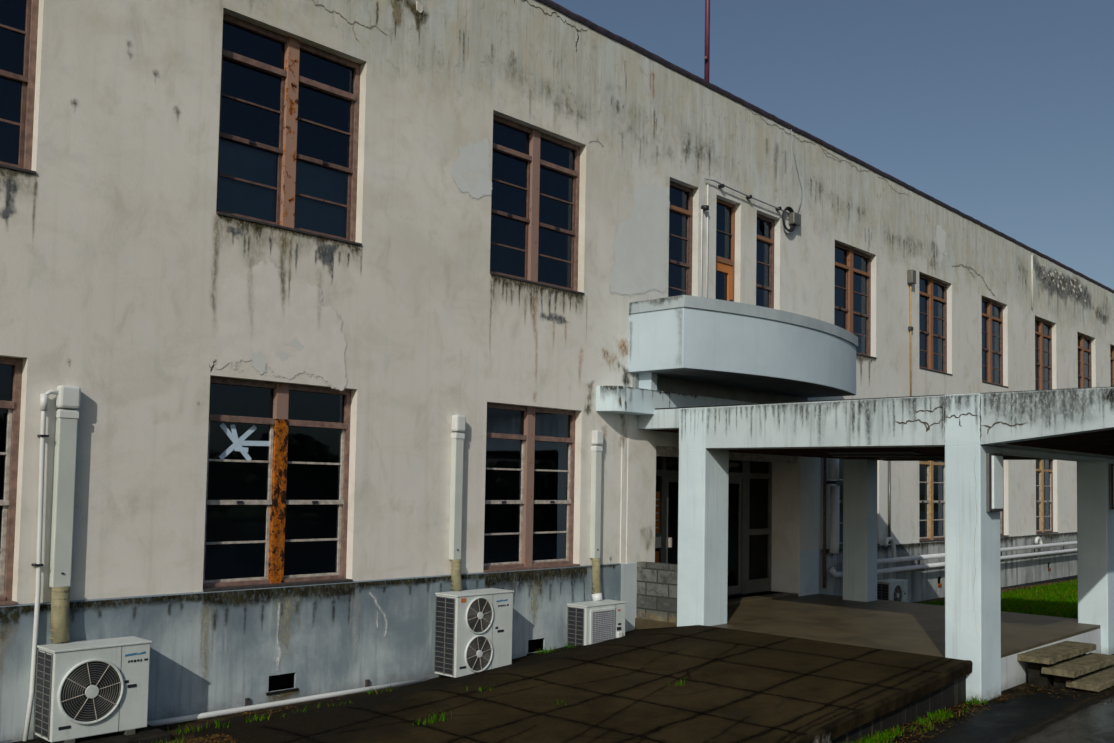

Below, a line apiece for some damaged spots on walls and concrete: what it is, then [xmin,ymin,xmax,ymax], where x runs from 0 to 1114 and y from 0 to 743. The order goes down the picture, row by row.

crack [313,0,387,42]
spalling [392,0,427,34]
leakage [0,167,37,220]
leakage [216,215,362,294]
crack [952,264,995,296]
leakage [984,388,1087,415]
crack [895,395,1025,619]